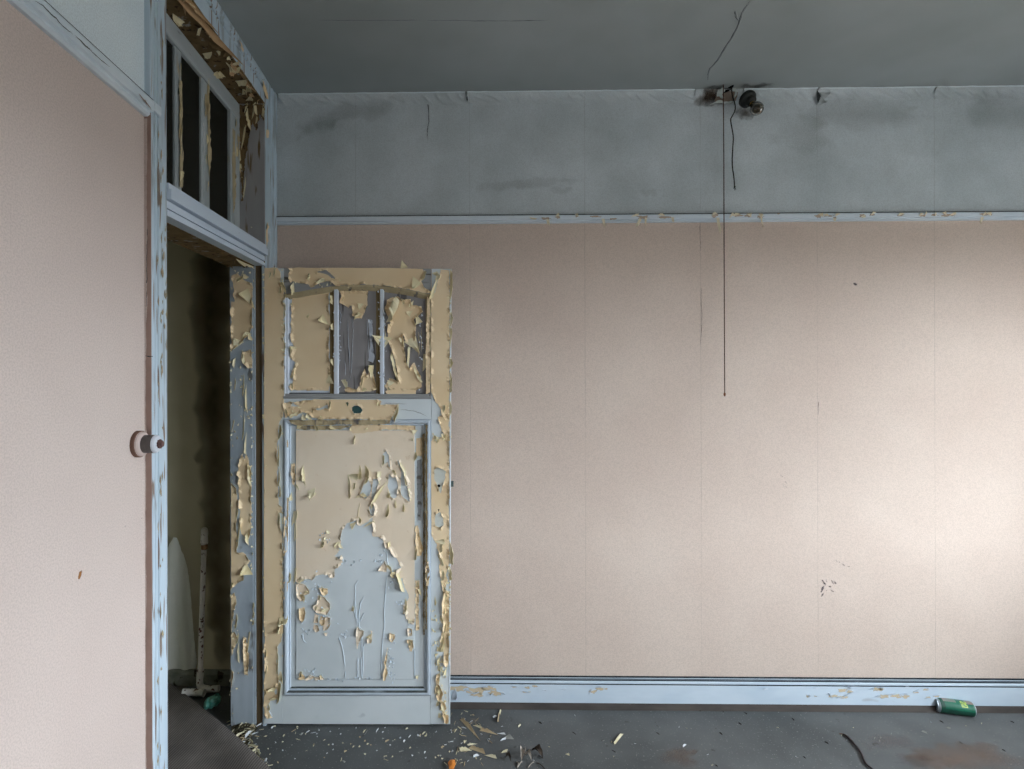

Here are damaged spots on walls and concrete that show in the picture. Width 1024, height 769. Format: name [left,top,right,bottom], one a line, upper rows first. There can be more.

peeling [173,0,269,213]
crack [707,1,751,78]
peeling [157,228,167,402]
peeling [212,252,547,769]
peeling [869,687,941,699]